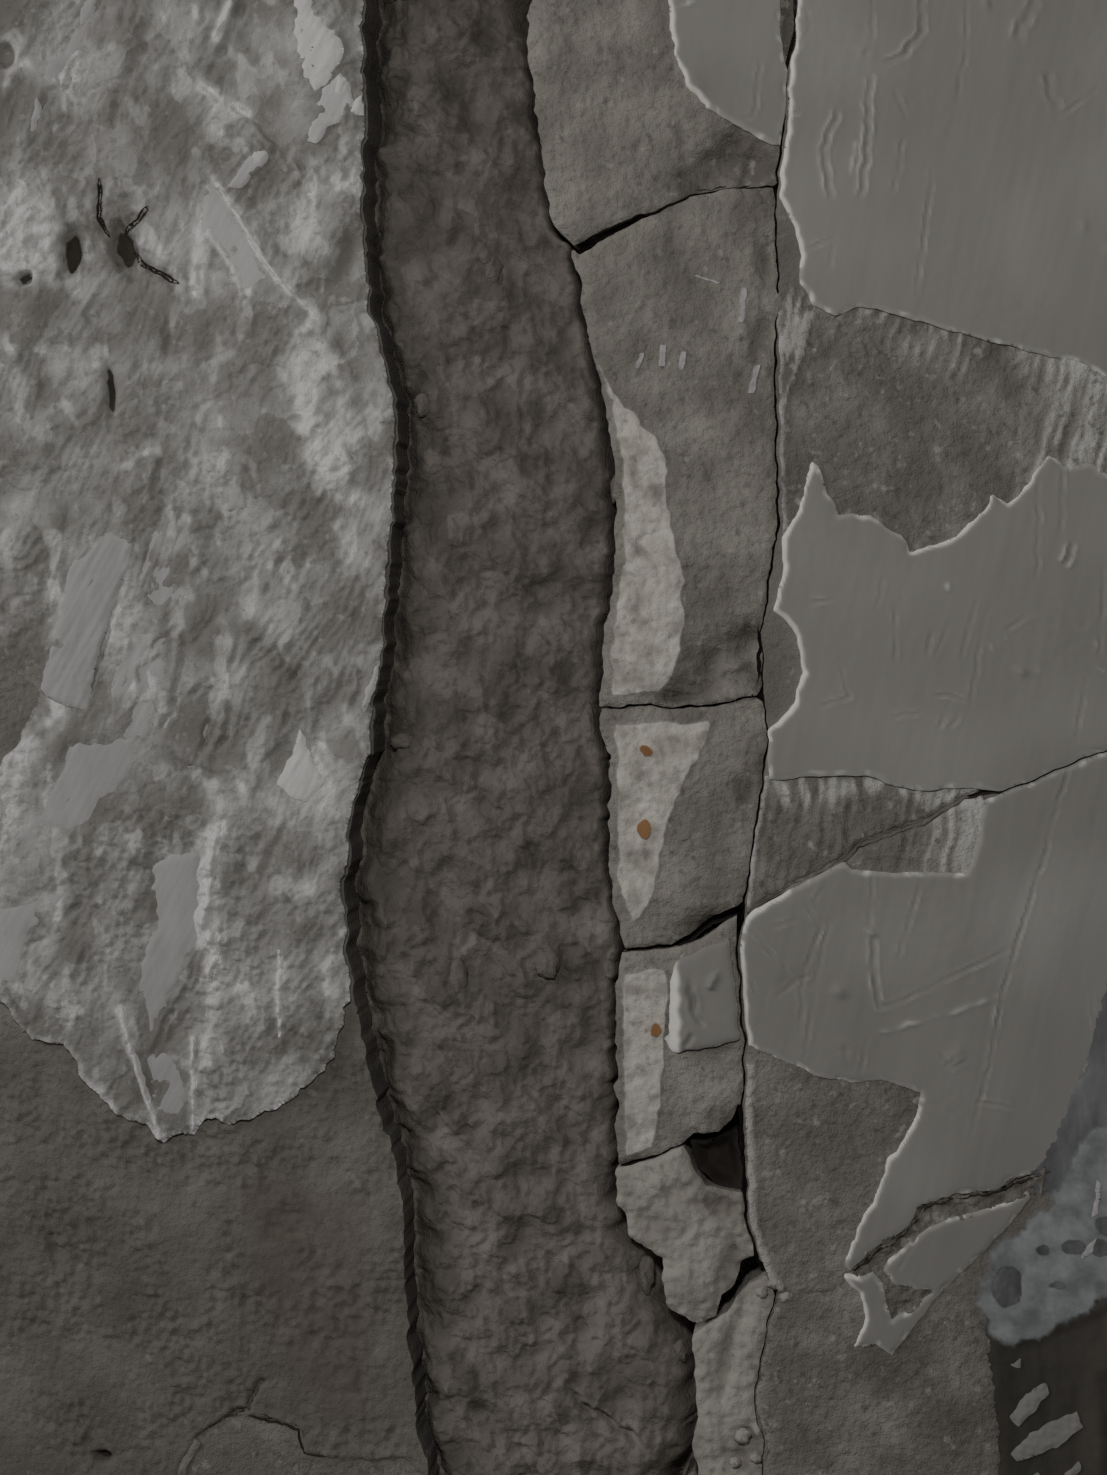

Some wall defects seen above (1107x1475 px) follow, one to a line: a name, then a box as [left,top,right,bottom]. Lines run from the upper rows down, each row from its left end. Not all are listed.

peeling [294,0,366,144]
spalling [96,178,179,284]
peeling [777,281,1107,552]
peeling [41,518,185,710]
crack [579,0,1107,1269]
peeling [0,633,170,841]
corrosion [637,819,651,839]
peeling [747,775,984,909]
peeling [139,851,200,1031]
corrosion [651,1023,661,1036]
crack [206,1380,324,1457]
leakage [986,1297,1107,1475]